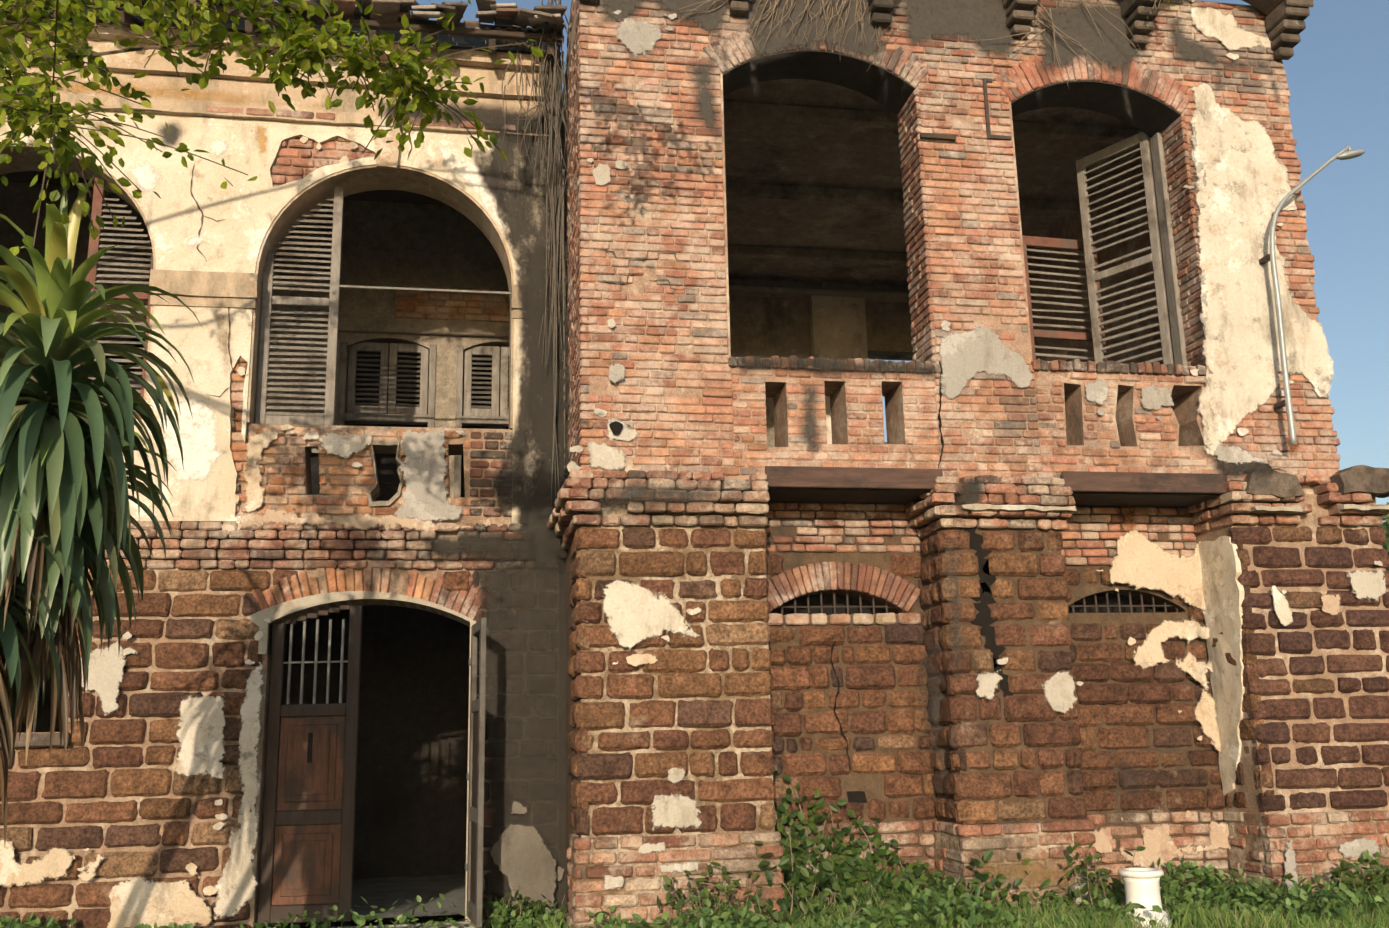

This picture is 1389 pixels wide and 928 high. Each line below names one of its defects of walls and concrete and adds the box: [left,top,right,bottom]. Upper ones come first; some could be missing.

peeling [1189,0,1272,60]
crack [190,164,225,261]
peeling [1183,83,1334,464]
peeling [163,357,503,536]
damp [381,103,570,919]
peeling [939,320,1034,408]
peeling [0,840,105,886]
peeling [107,659,264,928]
peeling [603,579,701,666]
crack [830,641,851,770]
crack [963,517,1014,697]
peeling [1097,530,1245,796]